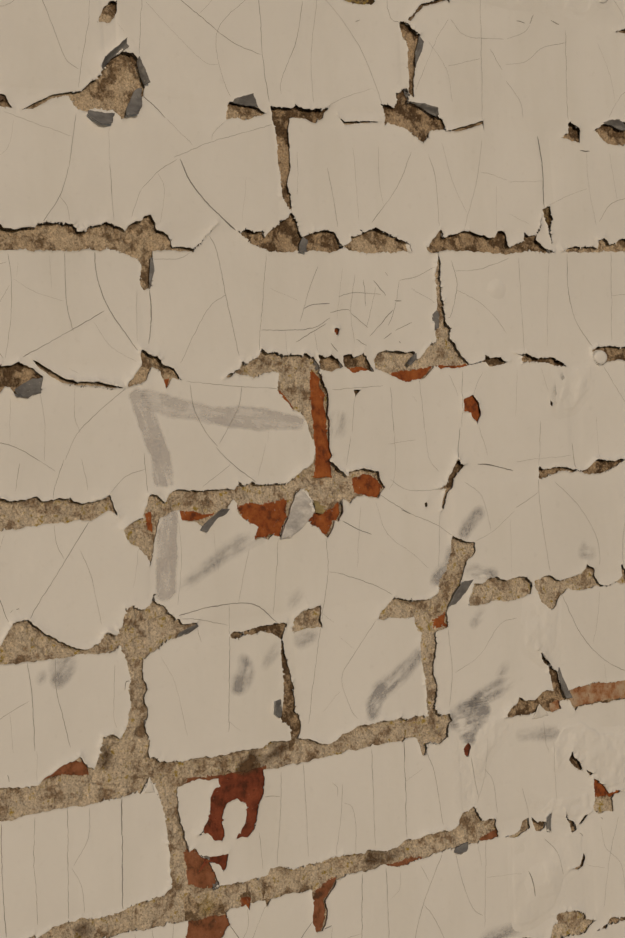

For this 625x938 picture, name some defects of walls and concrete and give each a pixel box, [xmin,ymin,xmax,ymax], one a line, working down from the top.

peeling [26,38,150,124]
crack [181,0,380,106]
peeling [341,0,483,142]
peeling [0,215,199,290]
crack [109,97,269,230]
peeling [226,93,408,254]
crack [327,136,623,227]
peeling [124,206,553,563]
crack [181,239,524,485]
crack [179,544,278,689]
peeling [0,536,602,938]
crack [118,801,126,907]